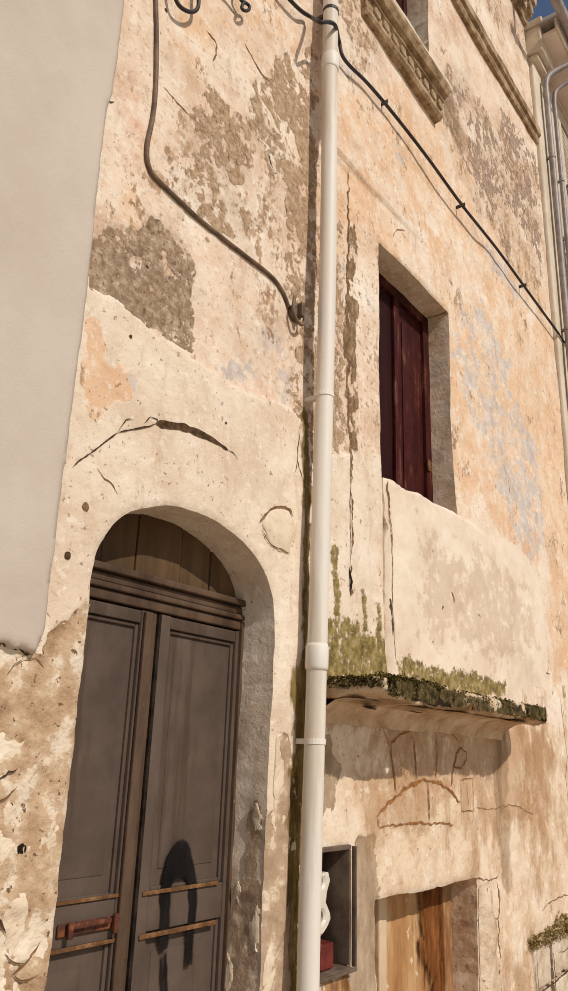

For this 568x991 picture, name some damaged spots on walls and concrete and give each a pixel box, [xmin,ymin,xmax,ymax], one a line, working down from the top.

flaking render [89,216,196,353]
crack [73,417,238,494]
flaking render [168,46,321,503]
crack [345,172,354,596]
flaking render [444,63,542,263]
peeling [0,604,90,991]
peeling [225,732,302,991]
leakage [285,407,311,991]
leakage [327,545,547,721]
crack [378,731,538,828]